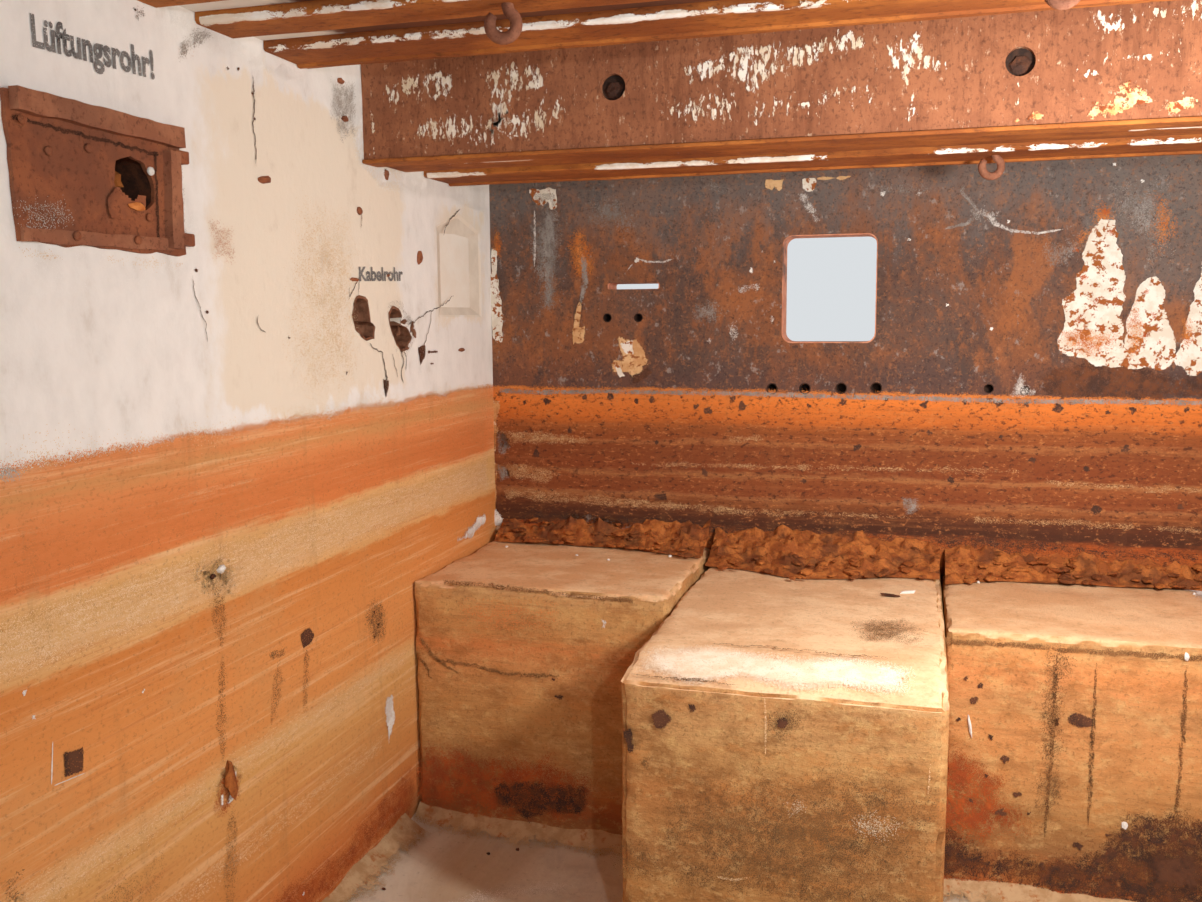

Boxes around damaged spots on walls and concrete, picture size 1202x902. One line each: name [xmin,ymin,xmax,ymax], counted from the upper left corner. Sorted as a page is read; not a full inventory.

peeling [1093,0,1202,33]
corrosion [1087,80,1198,119]
peeling [1057,198,1202,376]
spalling [352,295,416,356]
crack [371,296,452,396]
corrosion [572,302,585,344]
corrosion [1036,360,1202,410]
water stain [0,186,1202,902]
corrosion [195,560,235,645]
crack [417,636,559,678]
corrosion [215,767,242,817]